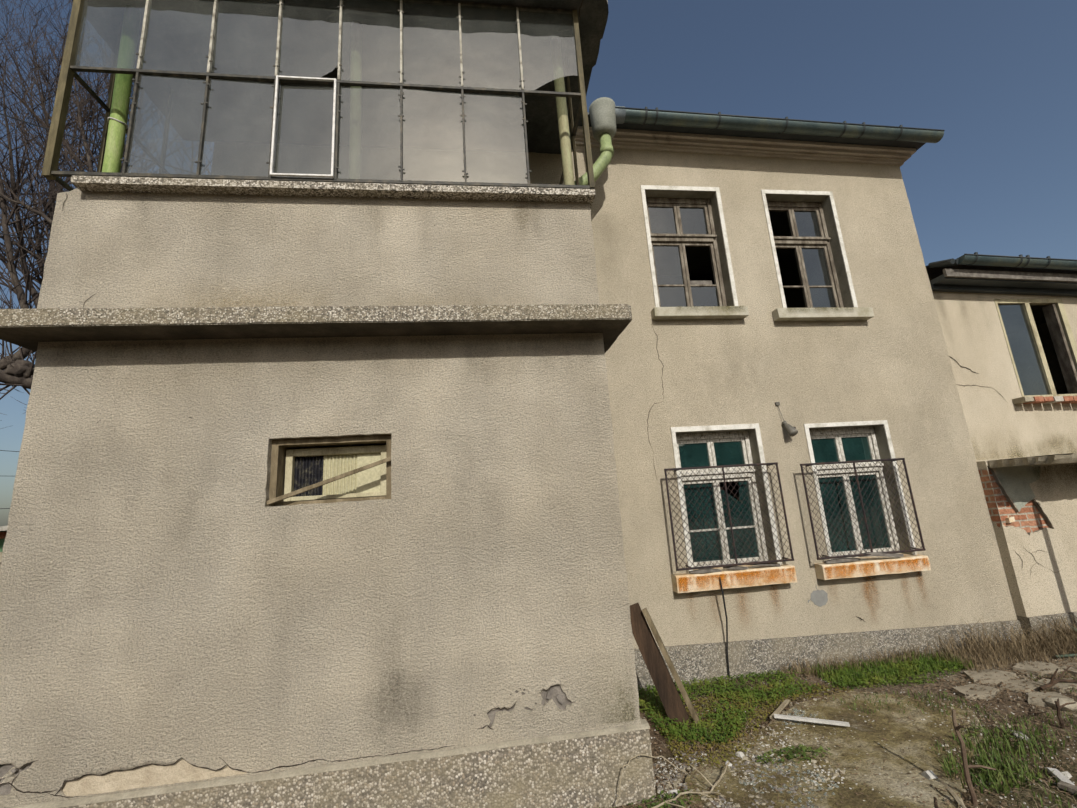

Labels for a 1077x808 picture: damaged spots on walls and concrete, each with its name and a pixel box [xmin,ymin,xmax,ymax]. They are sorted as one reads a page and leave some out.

crack [949,356,1006,401]
crack [647,324,664,479]
spalling [978,465,1054,533]
corrosion [679,569,791,601]
corrosion [828,558,928,600]
spalling [473,684,575,729]
flaking render [0,757,251,798]
crack [254,746,450,773]